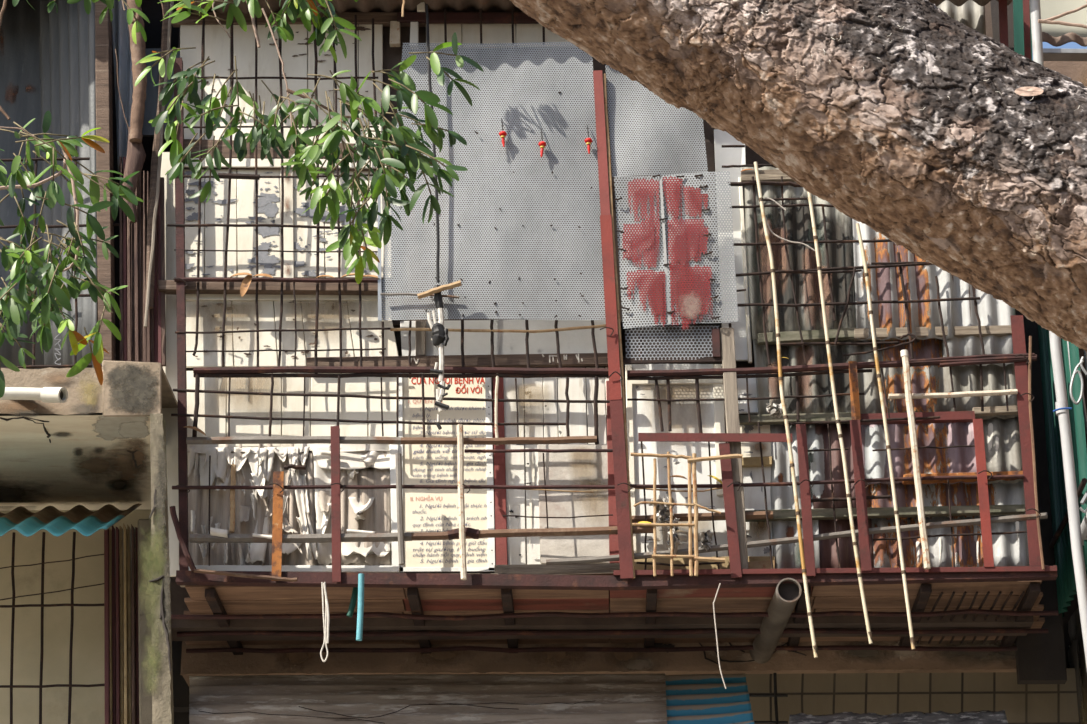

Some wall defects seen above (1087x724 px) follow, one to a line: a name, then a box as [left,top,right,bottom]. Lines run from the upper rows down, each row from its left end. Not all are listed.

peeling [184,169,238,228]
peeling [245,172,281,277]
peeling [293,186,365,277]
crack [0,417,51,443]
damp [106,365,158,413]
rust [862,233,996,568]
damp [0,484,36,509]
damp [74,435,171,656]
peeling [187,444,391,566]